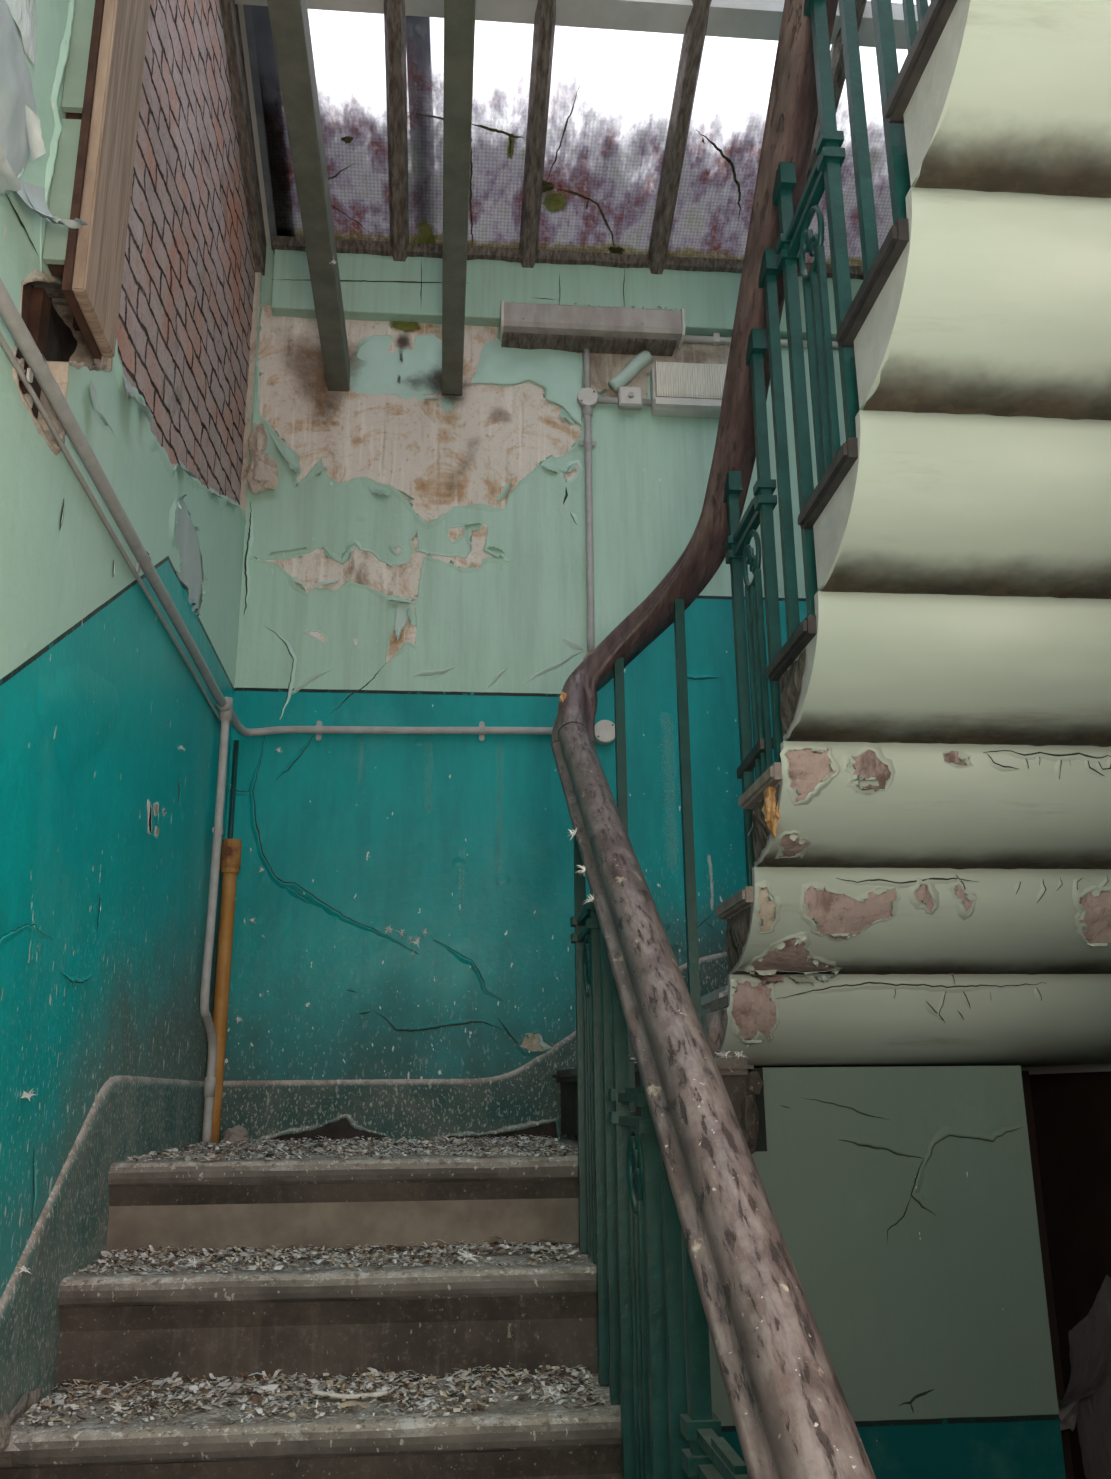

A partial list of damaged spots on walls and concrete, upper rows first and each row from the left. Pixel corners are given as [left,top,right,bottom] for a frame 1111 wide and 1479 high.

flaking render [0,0,730,663]
crack [228,502,518,1044]
peeling [780,742,895,806]
crack [983,750,1111,780]
peeling [1072,885,1111,949]
crack [0,924,93,983]
peeling [727,877,977,1047]